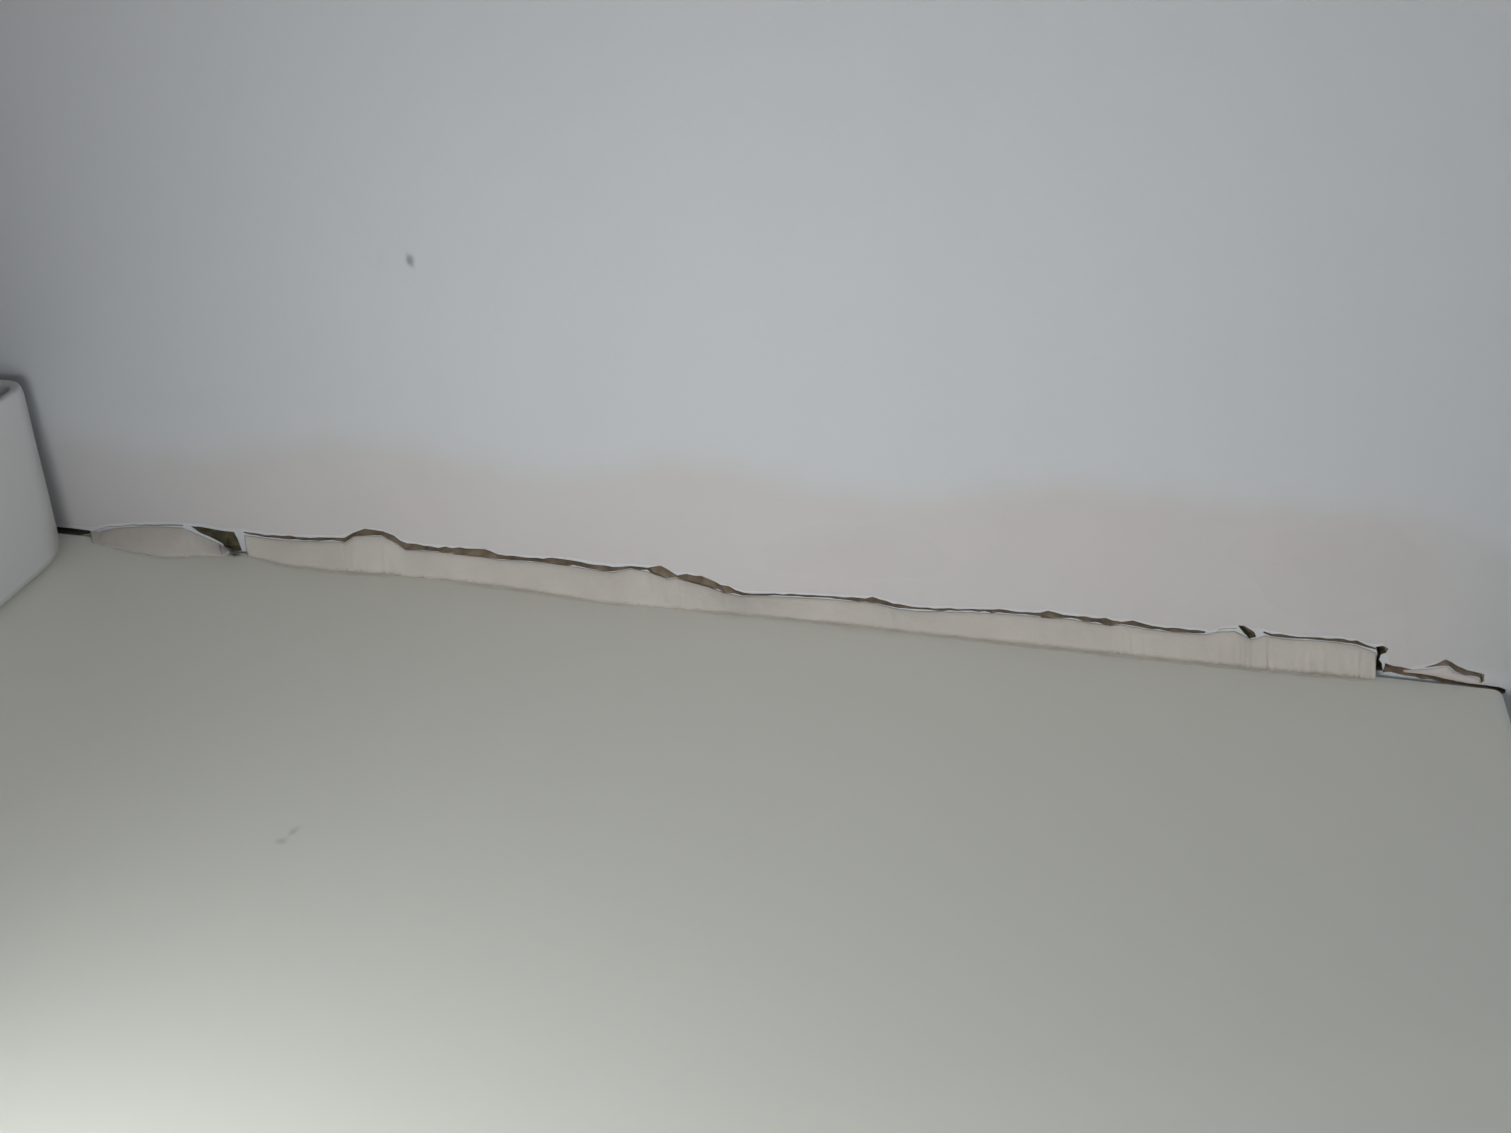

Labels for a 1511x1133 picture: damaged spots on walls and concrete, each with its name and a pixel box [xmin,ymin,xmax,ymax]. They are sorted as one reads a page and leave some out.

spalling [191,526,242,556]
crack [243,529,1506,693]
peeling [1239,626,1256,638]